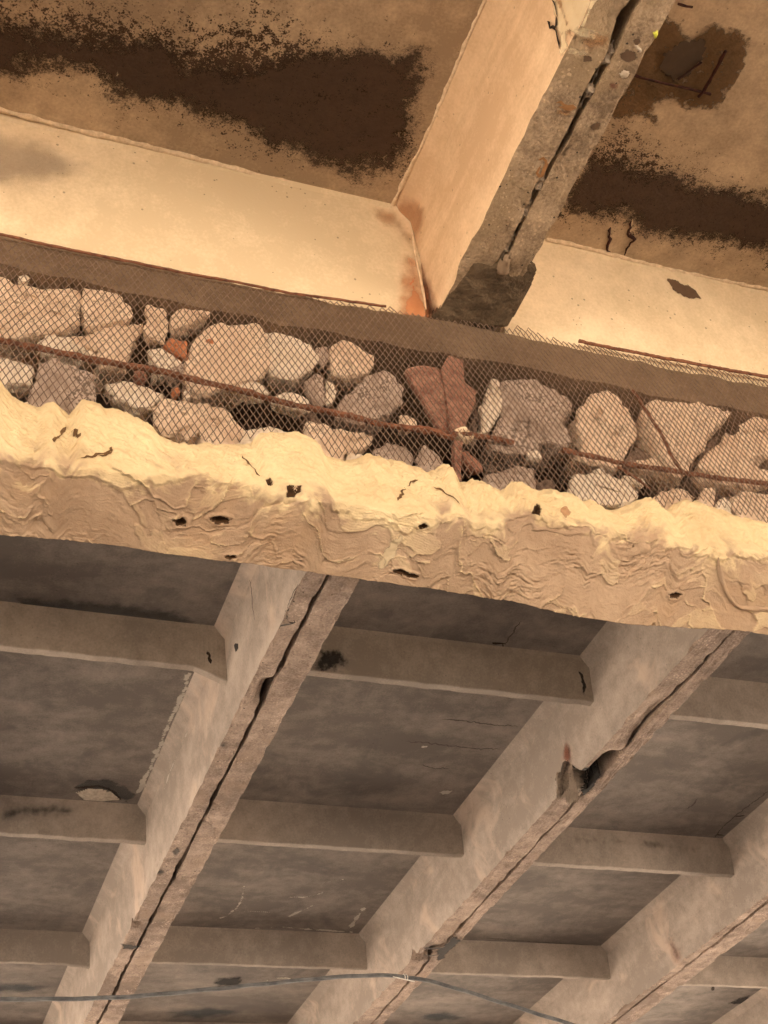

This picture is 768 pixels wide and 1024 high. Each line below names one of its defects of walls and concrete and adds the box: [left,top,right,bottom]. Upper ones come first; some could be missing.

water stain [0,107,290,181]
corrosion [403,273,436,317]
spalling [163,338,188,362]
crack [409,719,511,769]
spalling [75,780,135,801]
spalling [555,759,600,804]